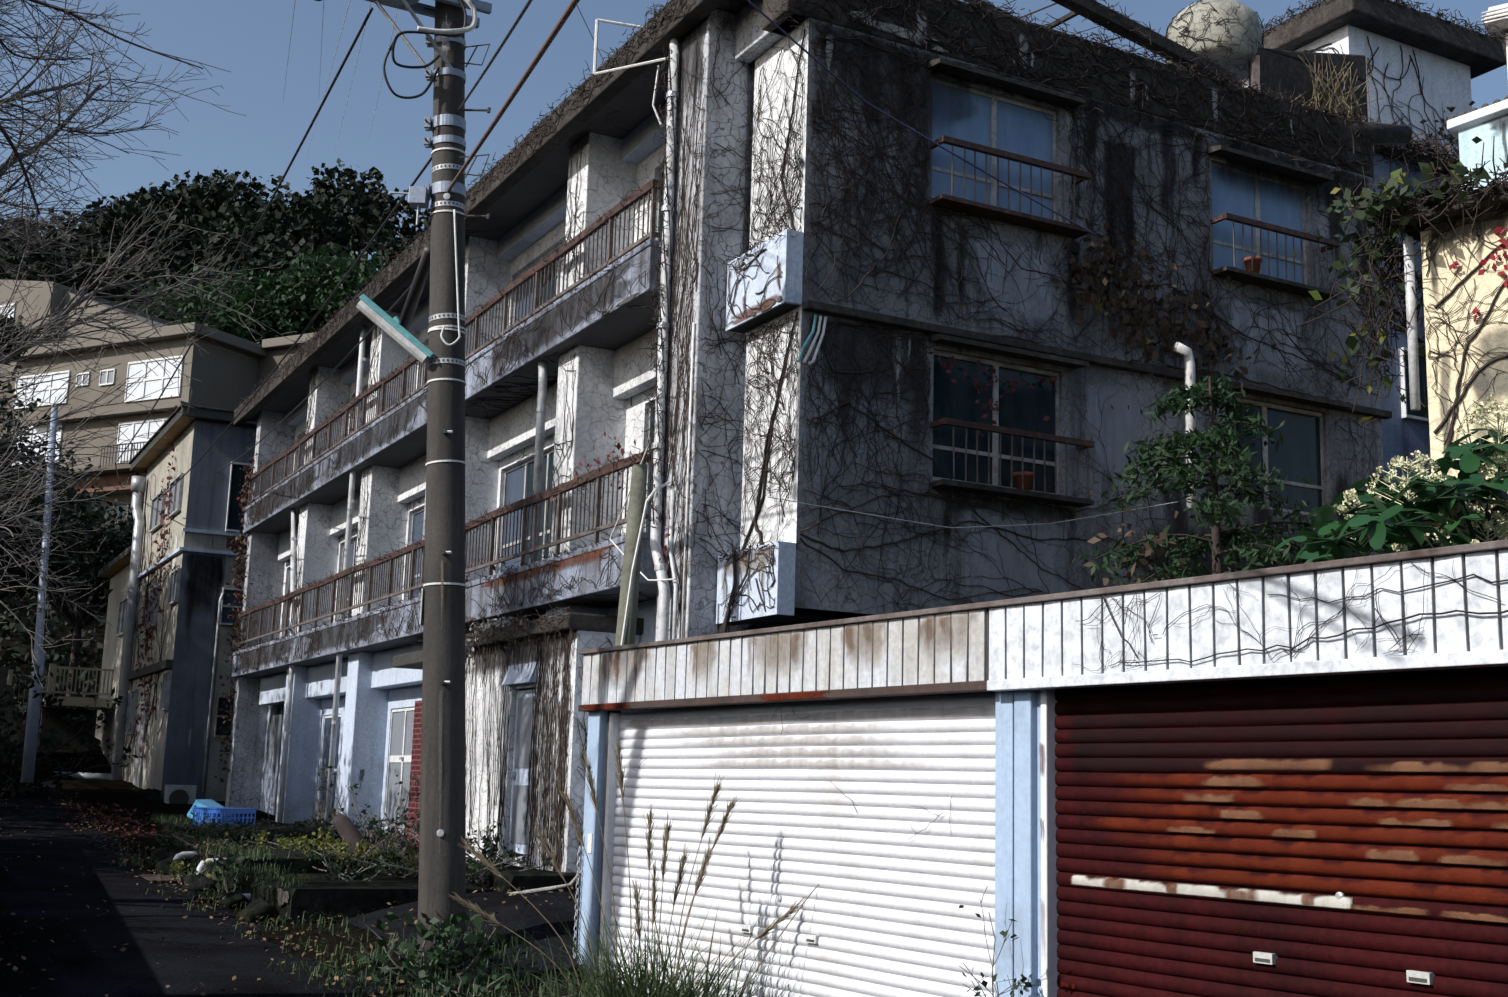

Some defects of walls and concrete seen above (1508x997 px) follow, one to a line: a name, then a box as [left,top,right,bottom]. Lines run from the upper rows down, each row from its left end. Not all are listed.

damp [917,9,927,34]
damp [822,26,1368,271]
damp [931,213,967,313]
damp [186,555,222,627]
rust [753,634,797,660]
peeling [1169,759,1328,833]
peeling [1352,762,1508,828]
rust [1102,774,1508,904]
peeling [1367,849,1418,860]
peeling [1440,856,1503,866]
peeling [1072,875,1425,915]
peeling [1447,912,1508,922]